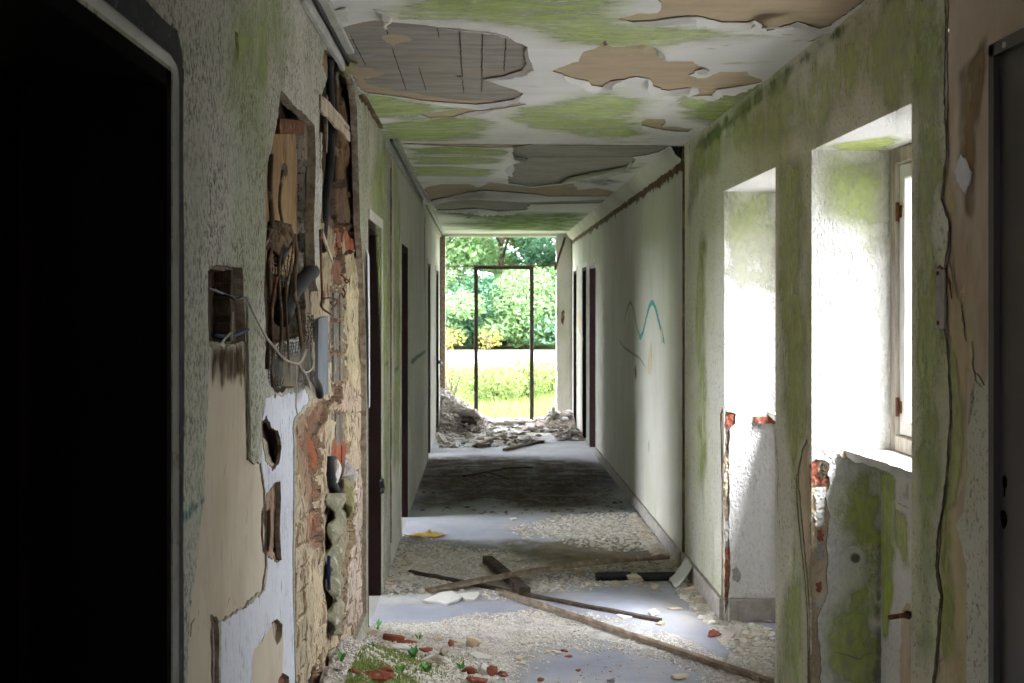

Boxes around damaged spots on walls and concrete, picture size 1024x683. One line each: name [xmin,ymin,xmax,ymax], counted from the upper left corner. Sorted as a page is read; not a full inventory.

peeling [335,7,535,118]
peeling [553,44,762,101]
peeling [620,0,863,42]
peeling [417,119,695,218]
water stain [212,347,246,389]
peeling [187,101,312,683]
flaking render [754,416,777,465]
crack [932,0,985,683]
spalling [721,410,741,610]
spalling [799,443,867,683]